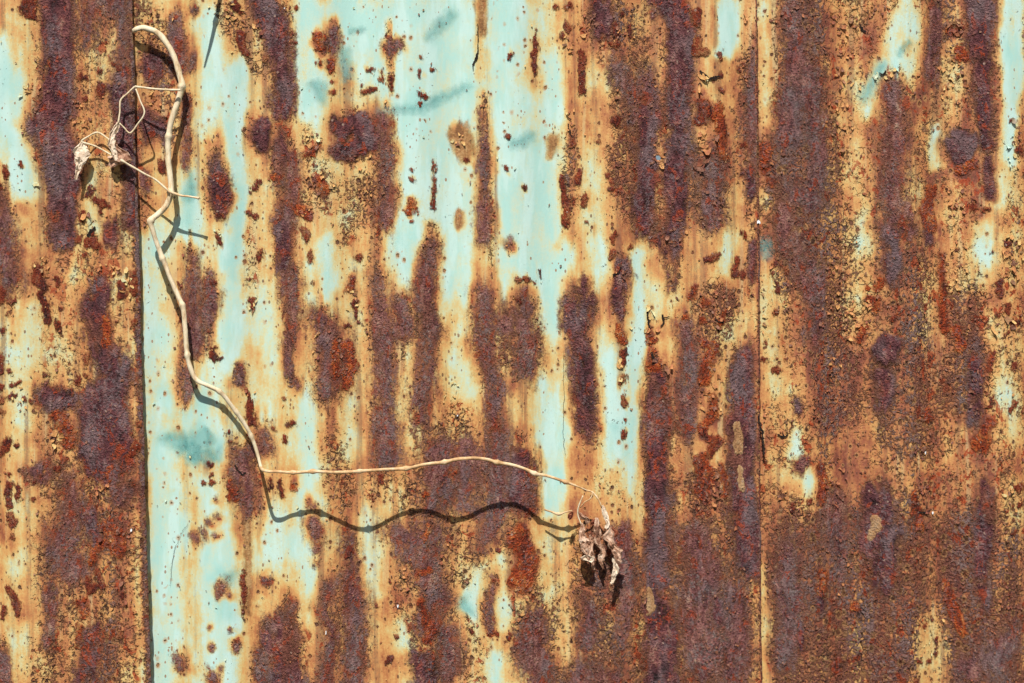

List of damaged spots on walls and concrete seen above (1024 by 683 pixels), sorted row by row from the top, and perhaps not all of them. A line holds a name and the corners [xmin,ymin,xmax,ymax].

rust [0,0,199,338]
rust [207,149,233,246]
rust [227,0,925,683]
peeling [693,130,720,174]
peeling [761,252,879,341]
peeling [825,0,857,157]
peeling [937,57,969,112]
peeling [942,241,969,294]
rust [924,0,1012,213]
peeling [1002,233,1024,285]
rust [0,270,142,683]
rust [201,362,298,621]